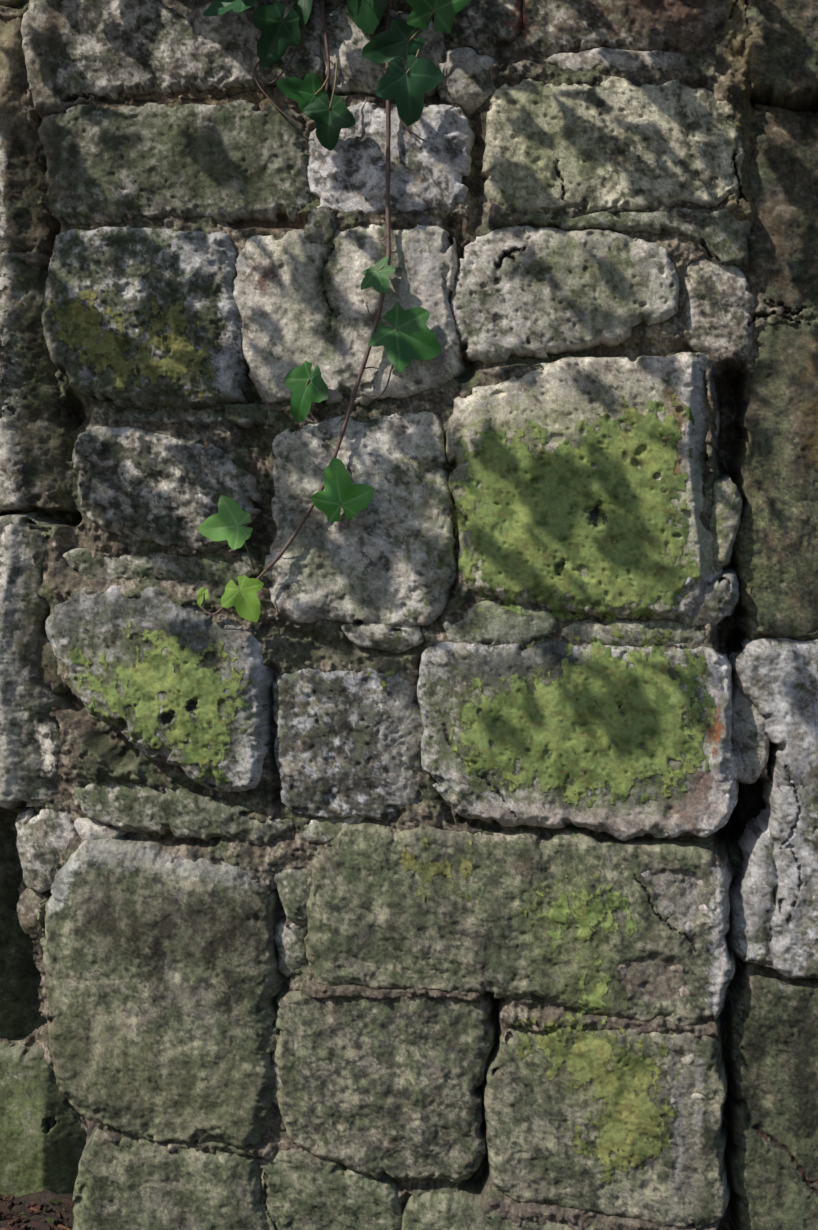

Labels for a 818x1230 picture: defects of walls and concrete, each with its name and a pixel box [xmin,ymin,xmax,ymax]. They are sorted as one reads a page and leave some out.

crack [555,159,566,201]
crack [494,247,526,271]
crack [753,1124,818,1195]